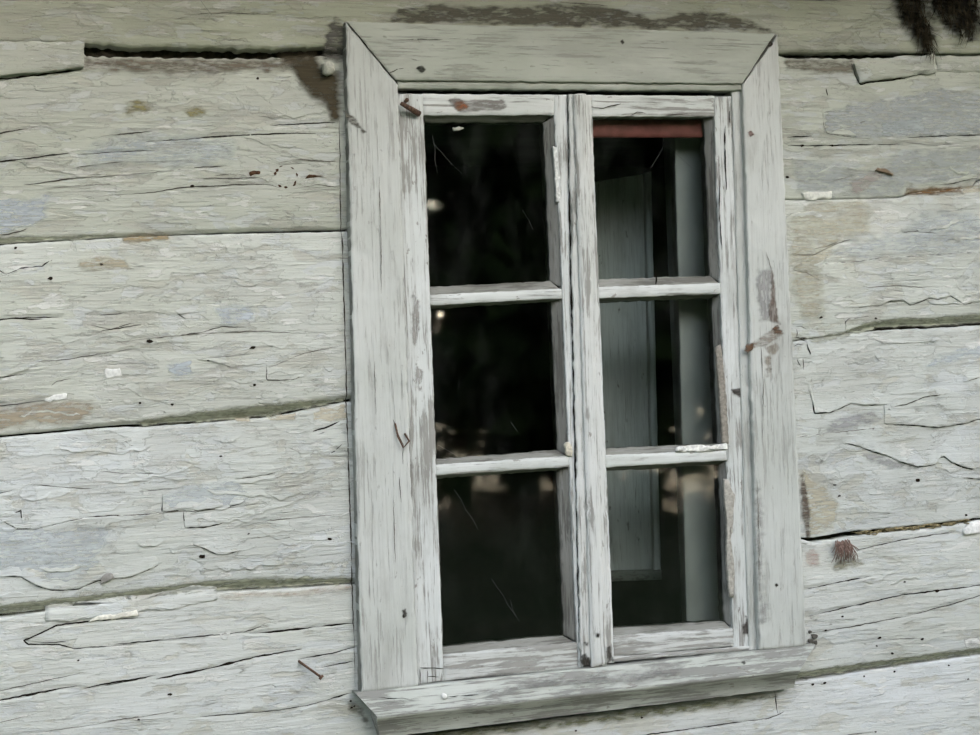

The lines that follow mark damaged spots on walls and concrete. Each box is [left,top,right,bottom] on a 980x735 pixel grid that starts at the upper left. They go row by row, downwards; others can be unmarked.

damp [891,0,980,64]
damp [281,54,340,120]
peeling [787,191,832,221]
peeling [907,172,980,241]
corrosion [753,274,783,370]
peeling [845,284,980,330]
peeling [104,368,122,379]
peeling [19,393,86,421]
crack [0,122,355,734]
peeling [0,438,355,622]
crack [393,477,401,559]